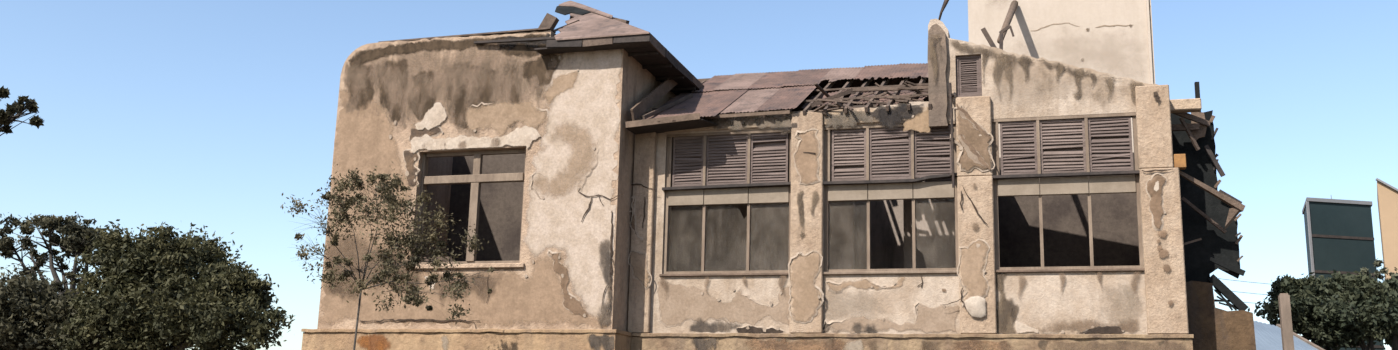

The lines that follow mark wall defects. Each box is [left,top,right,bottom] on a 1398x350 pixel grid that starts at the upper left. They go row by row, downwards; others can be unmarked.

leakage [345,33,563,128]
leakage [929,40,1144,102]
leakage [589,240,614,350]
crack [578,183,656,310]
peeling [321,49,995,350]
spalling [1015,321,1134,334]